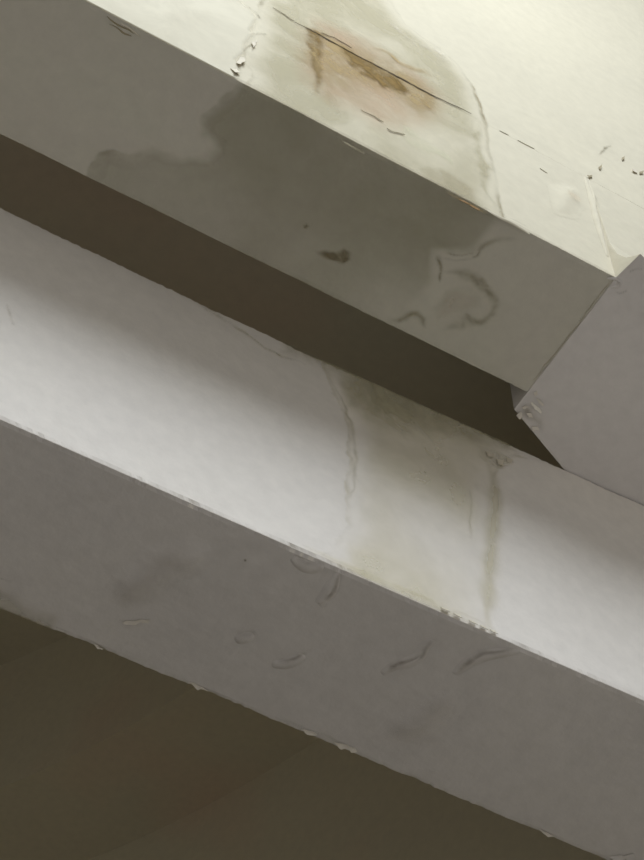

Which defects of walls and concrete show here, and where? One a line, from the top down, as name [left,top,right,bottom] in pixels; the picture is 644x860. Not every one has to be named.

damp [316,0,459,104]